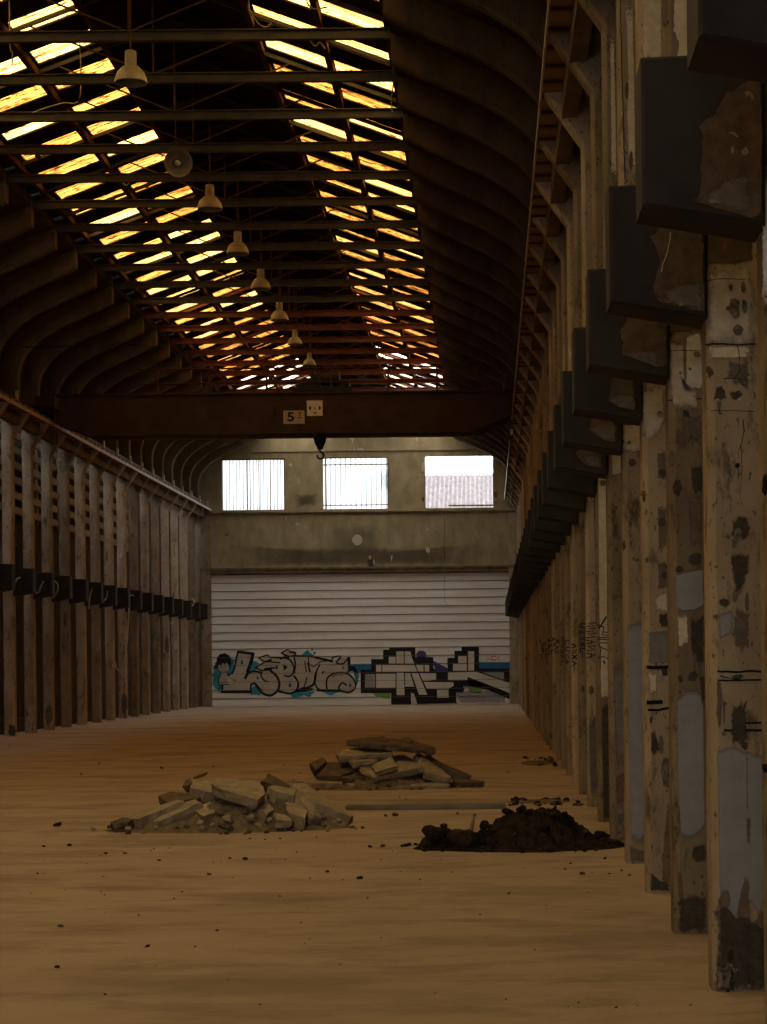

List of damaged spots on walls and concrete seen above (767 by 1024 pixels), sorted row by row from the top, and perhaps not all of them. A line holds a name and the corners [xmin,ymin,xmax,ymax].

peeling [695,80,763,218]
peeling [649,227,753,311]
peeling [620,317,668,368]
leakage [719,517,750,650]
leakage [651,805,765,989]